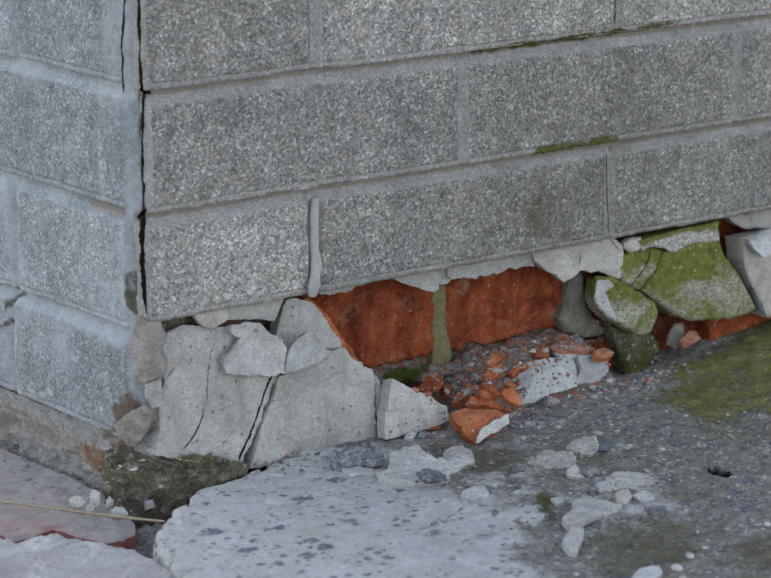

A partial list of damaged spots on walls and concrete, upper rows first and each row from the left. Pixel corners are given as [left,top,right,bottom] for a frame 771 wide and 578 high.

crack [120,0,151,314]
spalling [715,218,748,259]
peeling [219,321,287,376]
spalling [293,238,624,412]
spalling [651,313,771,351]
crack [183,349,212,450]
crack [239,376,272,460]